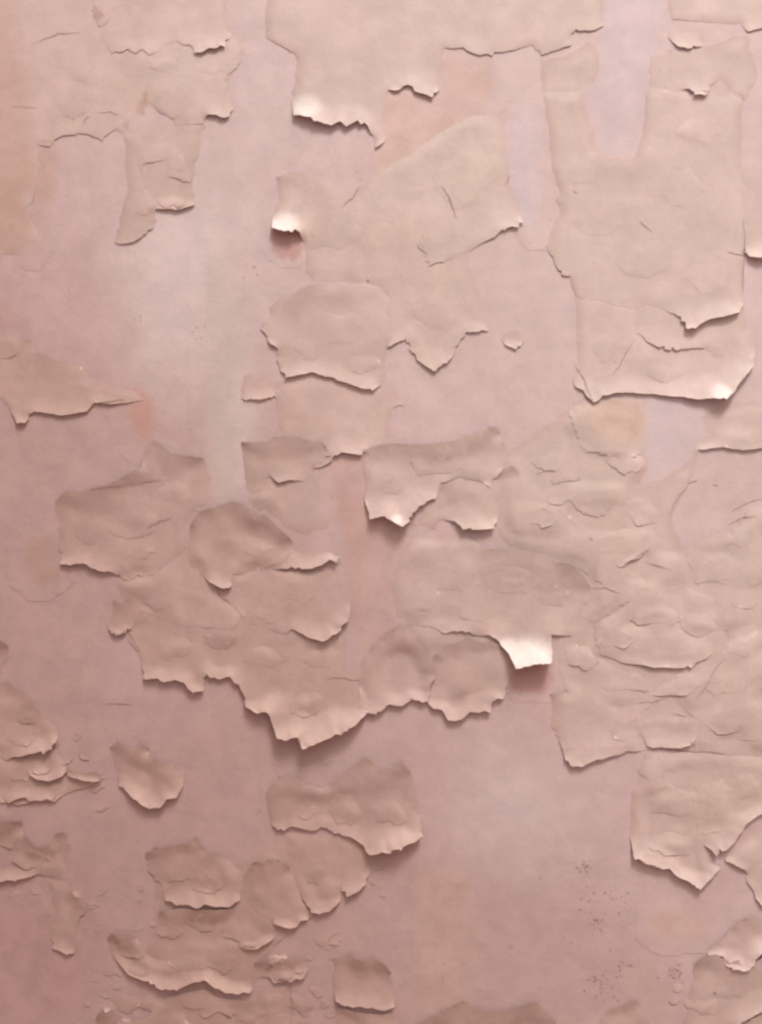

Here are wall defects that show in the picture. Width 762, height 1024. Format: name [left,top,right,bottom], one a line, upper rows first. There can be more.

peeling [38,0,245,244]
peeling [265,0,604,148]
peeling [541,0,762,402]
peeling [0,335,147,423]
peeling [54,115,762,905]
peeling [0,641,185,809]
peeling [0,821,108,955]
peeling [84,757,423,1024]
peeling [669,915,762,1024]